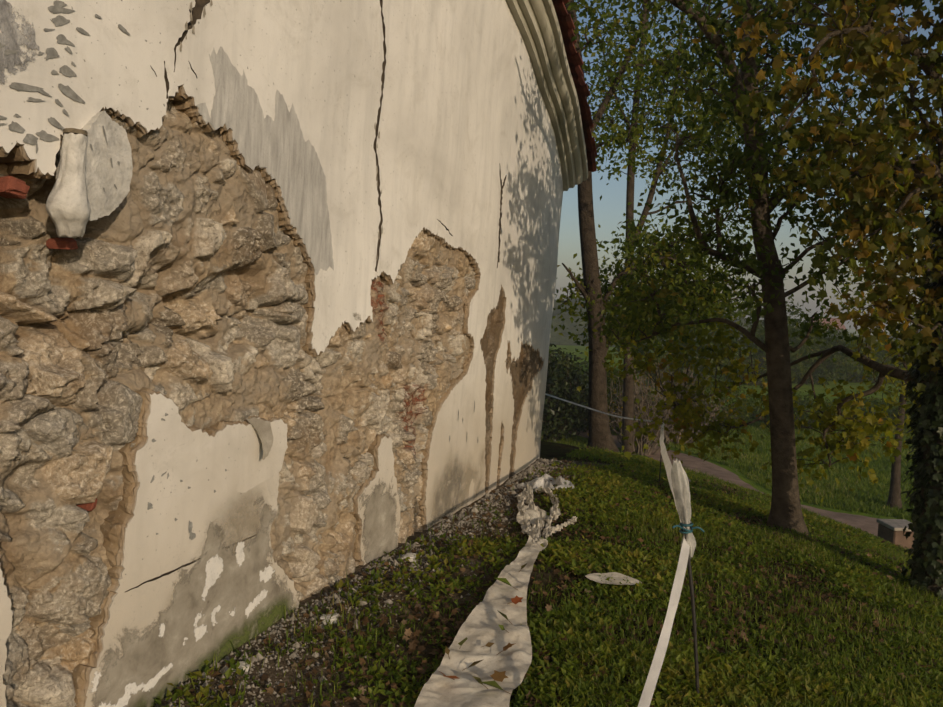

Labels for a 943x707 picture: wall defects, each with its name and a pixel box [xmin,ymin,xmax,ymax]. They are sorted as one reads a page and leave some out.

crack [150,0,213,99]
crack [373,0,386,272]
flaking render [0,0,544,707]
crack [125,535,256,592]